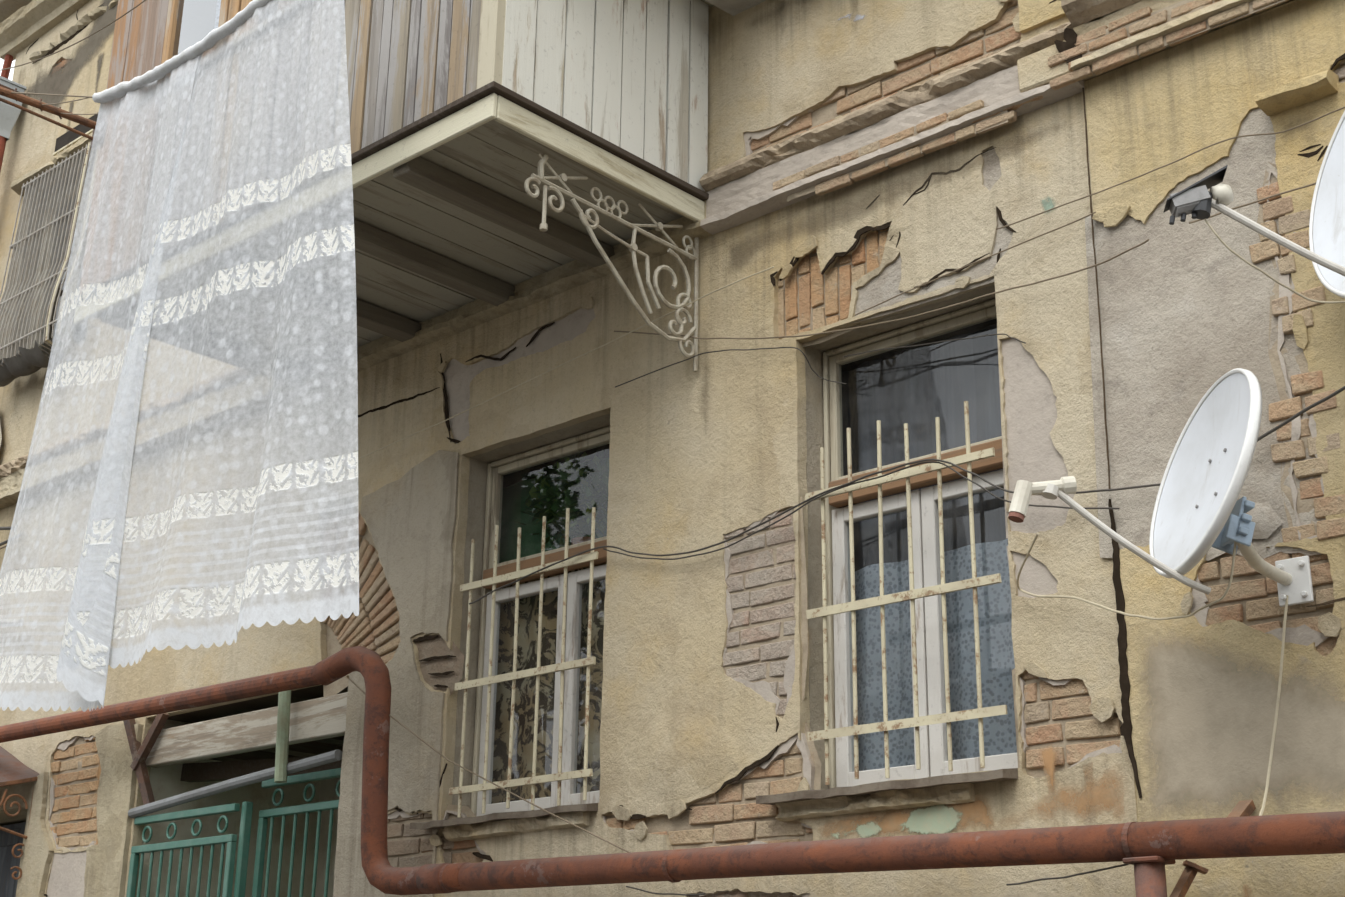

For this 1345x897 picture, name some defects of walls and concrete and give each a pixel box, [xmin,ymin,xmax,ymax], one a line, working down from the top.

flaking render [744,0,1289,202]
crack [1330,53,1345,70]
flaking render [778,217,1013,347]
crack [338,322,554,443]
flaking render [1085,108,1345,657]
flaking render [323,498,464,697]
flaking render [723,497,808,719]
flaking render [46,735,100,897]
crack [619,805,646,819]
flaking render [603,722,821,850]
crack [685,717,779,811]
flaking render [1012,662,1123,778]